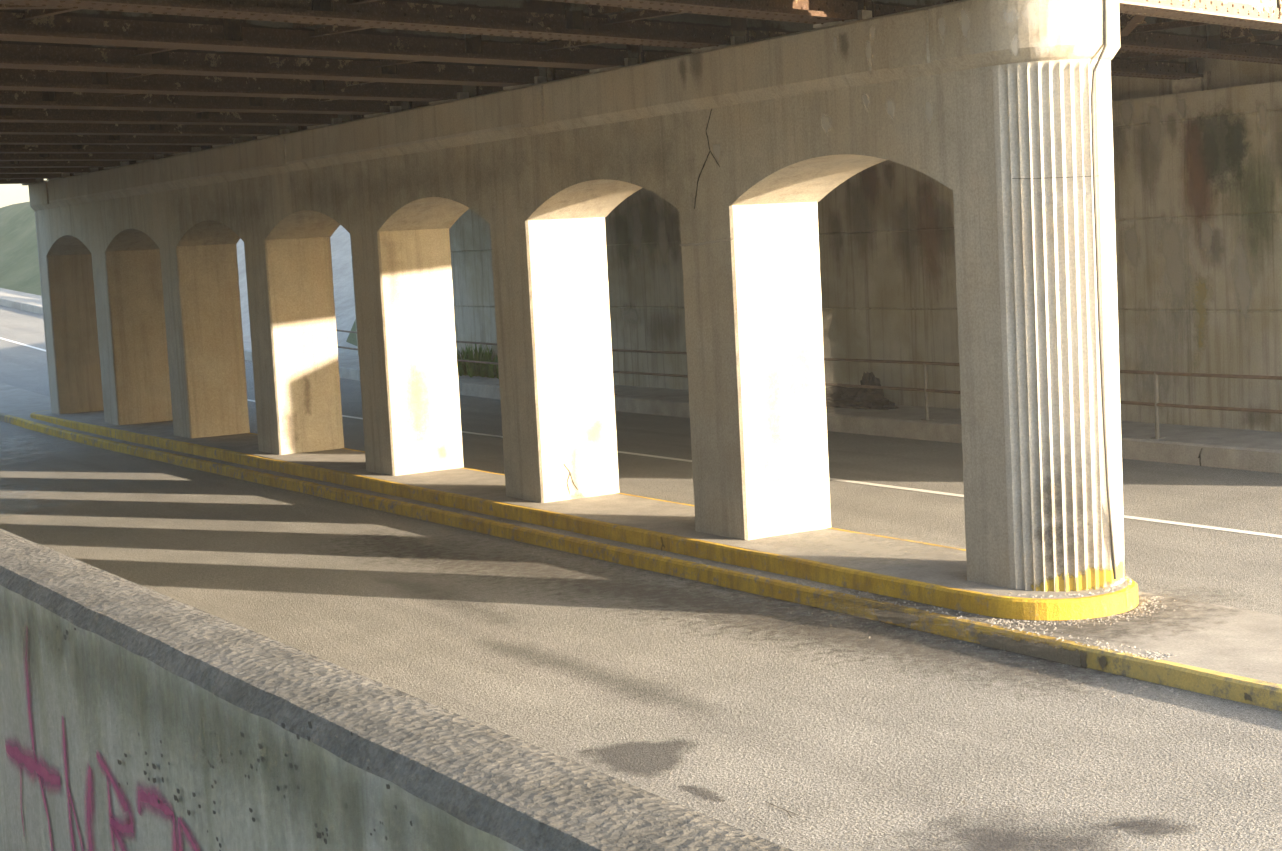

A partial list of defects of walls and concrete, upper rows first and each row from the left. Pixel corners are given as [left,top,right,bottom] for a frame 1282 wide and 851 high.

crack [694,109,720,209]